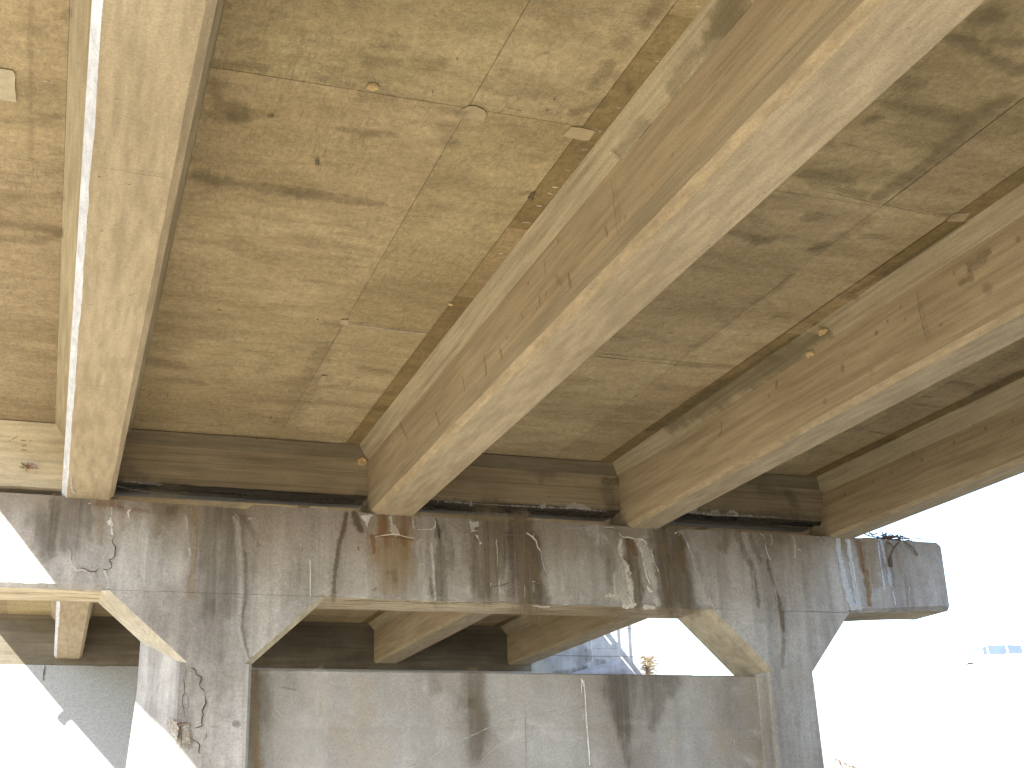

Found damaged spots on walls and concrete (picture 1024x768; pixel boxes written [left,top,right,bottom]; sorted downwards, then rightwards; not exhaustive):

crack [67,536,116,588]
water stain [116,484,358,602]
efflorescence [835,538,863,611]
spalling [166,718,193,748]
crack [182,667,215,760]